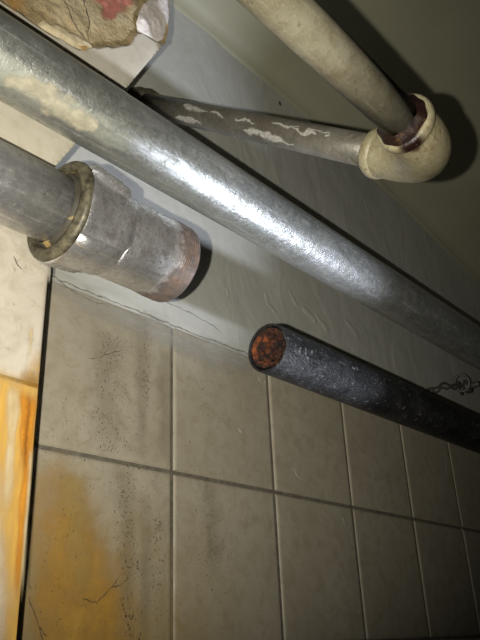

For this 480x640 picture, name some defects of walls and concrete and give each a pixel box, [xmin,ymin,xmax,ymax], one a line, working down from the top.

spalling [1,0,169,50]
crack [49,275,248,354]
rust [0,372,40,640]